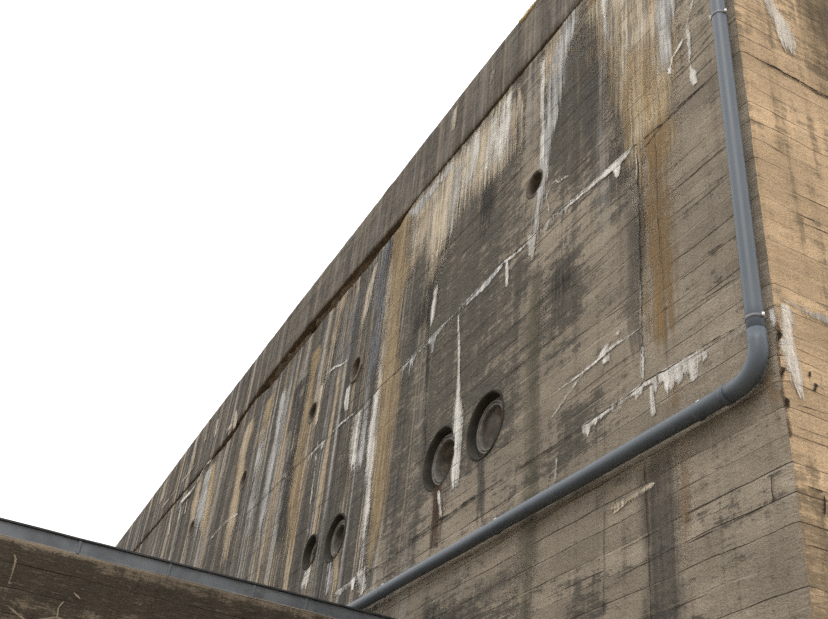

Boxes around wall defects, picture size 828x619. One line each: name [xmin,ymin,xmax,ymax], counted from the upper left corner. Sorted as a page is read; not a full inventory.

efflorescence [656,0,697,85]
leakage [764,0,796,55]
crack [10,601,64,619]
leakage [247,378,307,547]
leakage [309,386,379,596]
rust [361,262,378,327]
rust [367,198,419,570]
crack [211,79,745,576]
leakage [402,0,634,490]
rust [589,0,677,345]
leakage [582,346,711,437]
leakage [644,467,679,619]